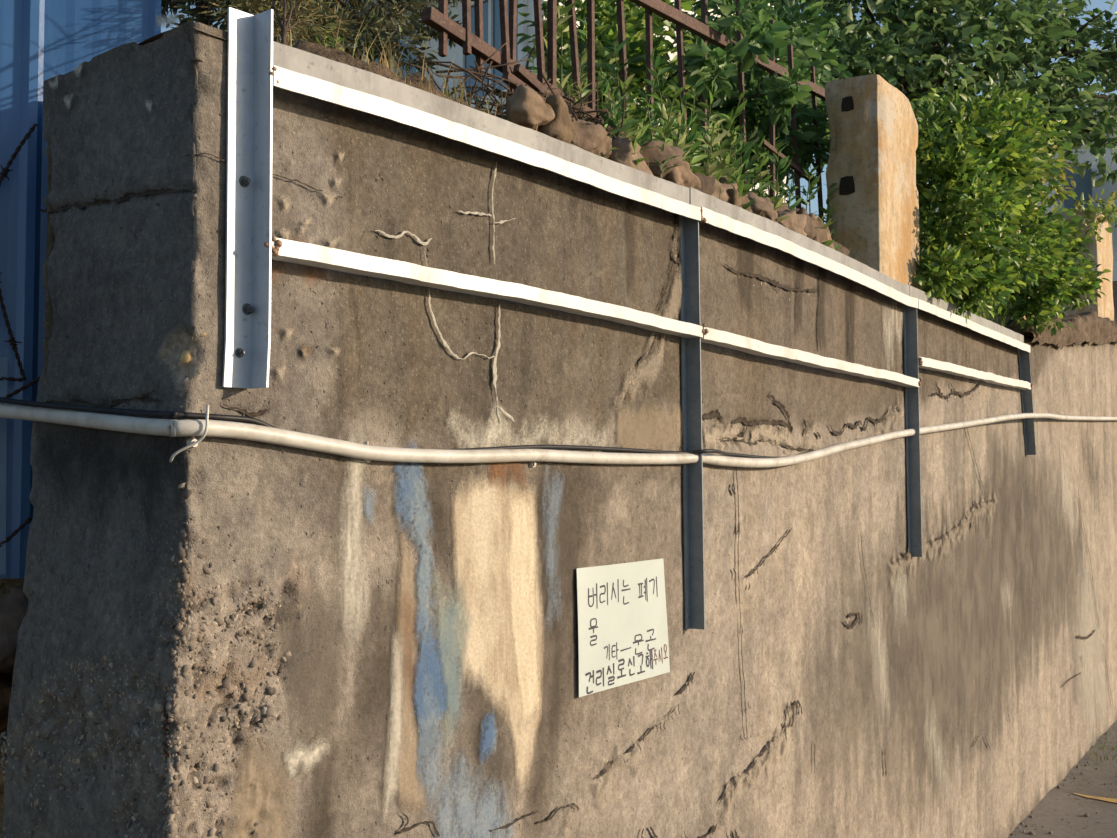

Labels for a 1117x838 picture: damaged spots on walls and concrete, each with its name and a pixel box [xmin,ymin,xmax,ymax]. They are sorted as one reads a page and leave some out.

crack [375,230,515,423]
crack [459,161,516,264]
peeling [623,331,664,397]
peeling [665,275,683,319]
crack [725,259,822,351]
spalling [177,482,195,503]
crack [844,379,998,645]
spalling [0,522,316,838]
damp [541,492,580,734]
crack [596,672,695,783]
crack [641,394,902,838]
damp [896,441,1081,787]